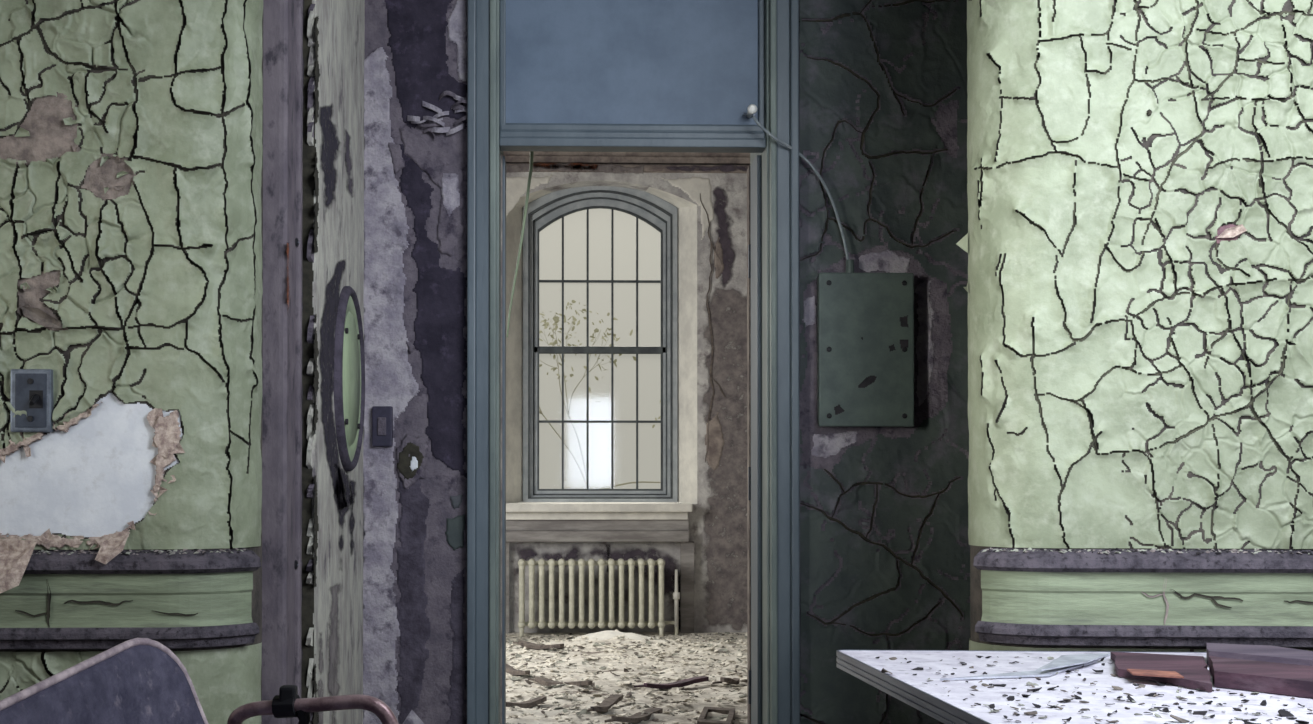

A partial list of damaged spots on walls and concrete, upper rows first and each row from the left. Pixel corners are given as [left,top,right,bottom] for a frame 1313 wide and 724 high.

crack [0,0,254,456]
peeling [0,0,263,593]
spalling [301,0,320,724]
peeling [363,0,468,724]
peeling [506,175,552,218]
peeling [661,177,714,240]
crack [799,0,957,261]
crack [800,469,963,648]
peeling [800,0,1313,724]
crack [978,0,1313,550]
crack [1142,580,1243,624]
crack [1284,598,1313,606]